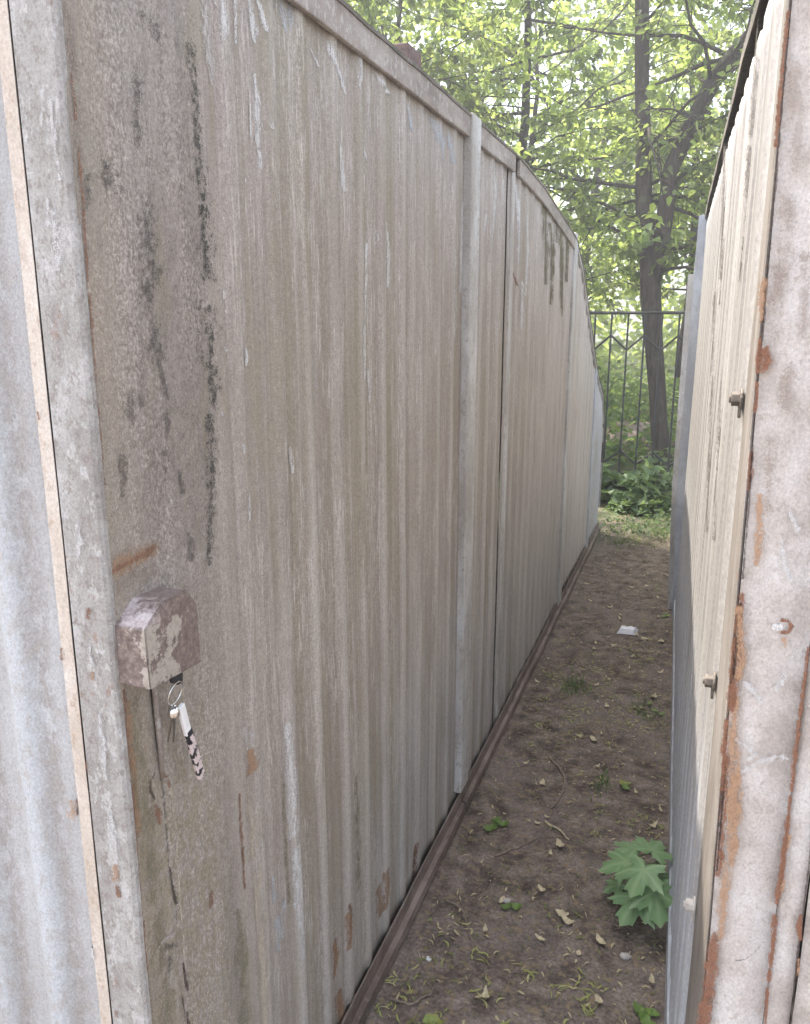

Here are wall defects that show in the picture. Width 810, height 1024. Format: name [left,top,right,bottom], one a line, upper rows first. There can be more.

water stain [82,150,121,212]
water stain [136,197,167,309]
water stain [541,206,569,316]
rust [757,277,767,323]
rust [760,345,773,373]
rust [754,494,764,566]
rust [112,544,159,594]
rust [771,618,794,647]
rust [696,604,747,1024]